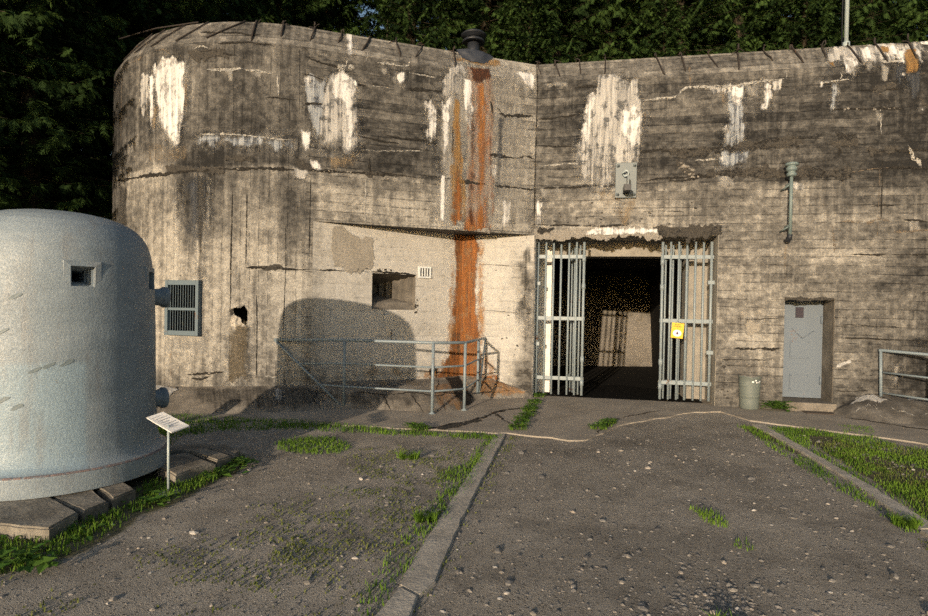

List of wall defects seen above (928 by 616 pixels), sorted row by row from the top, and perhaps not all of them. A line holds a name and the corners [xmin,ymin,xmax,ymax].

corrosion [426,58,523,397]
spalling [535,223,722,243]
spalling [229,305,248,327]